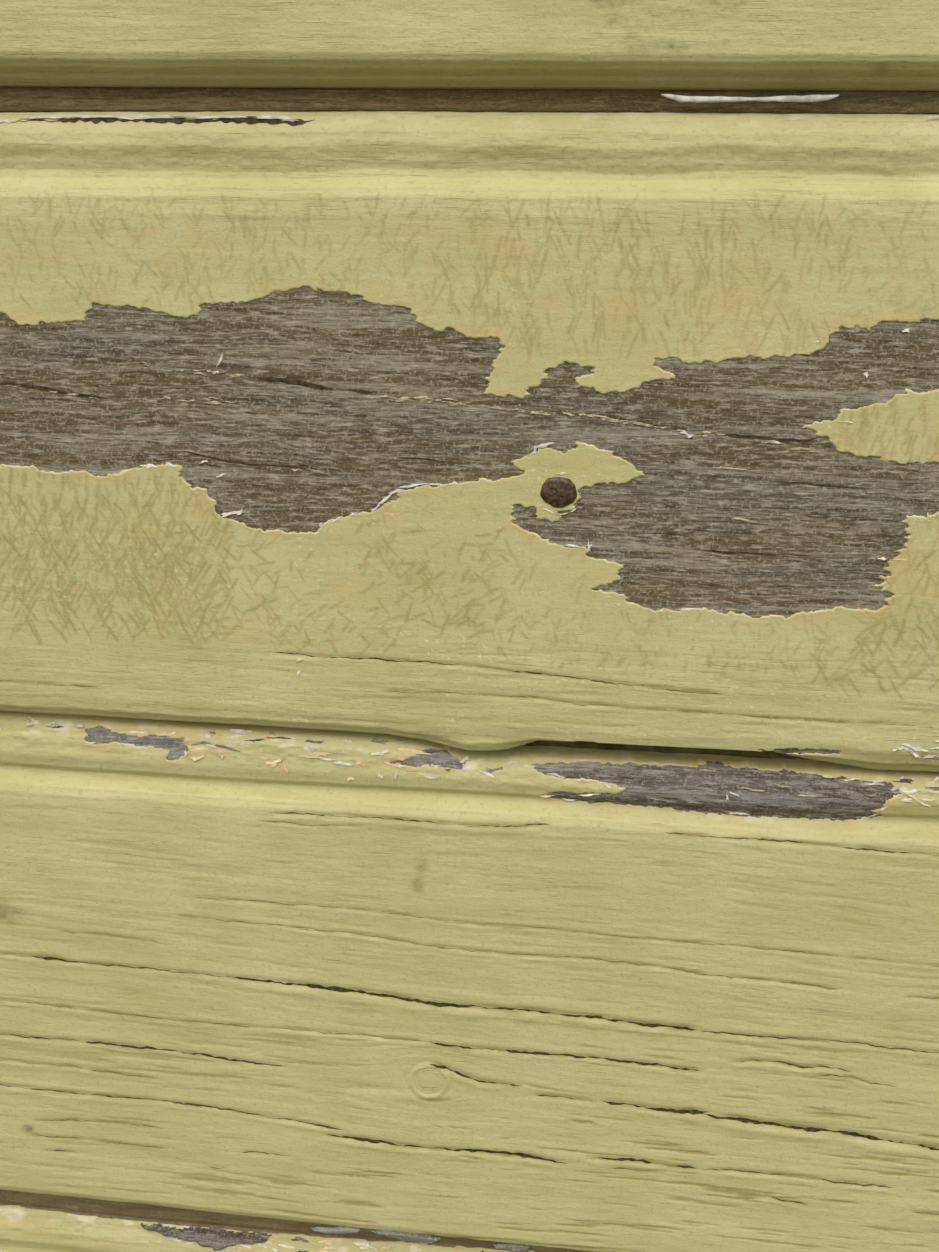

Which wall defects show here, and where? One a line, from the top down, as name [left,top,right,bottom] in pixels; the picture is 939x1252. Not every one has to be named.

peeling [0,286,939,618]
peeling [25,715,939,821]
crack [0,1002,939,1164]
crack [11,931,939,1087]
peeling [141,1222,442,1252]
crack [601,1158,892,1205]